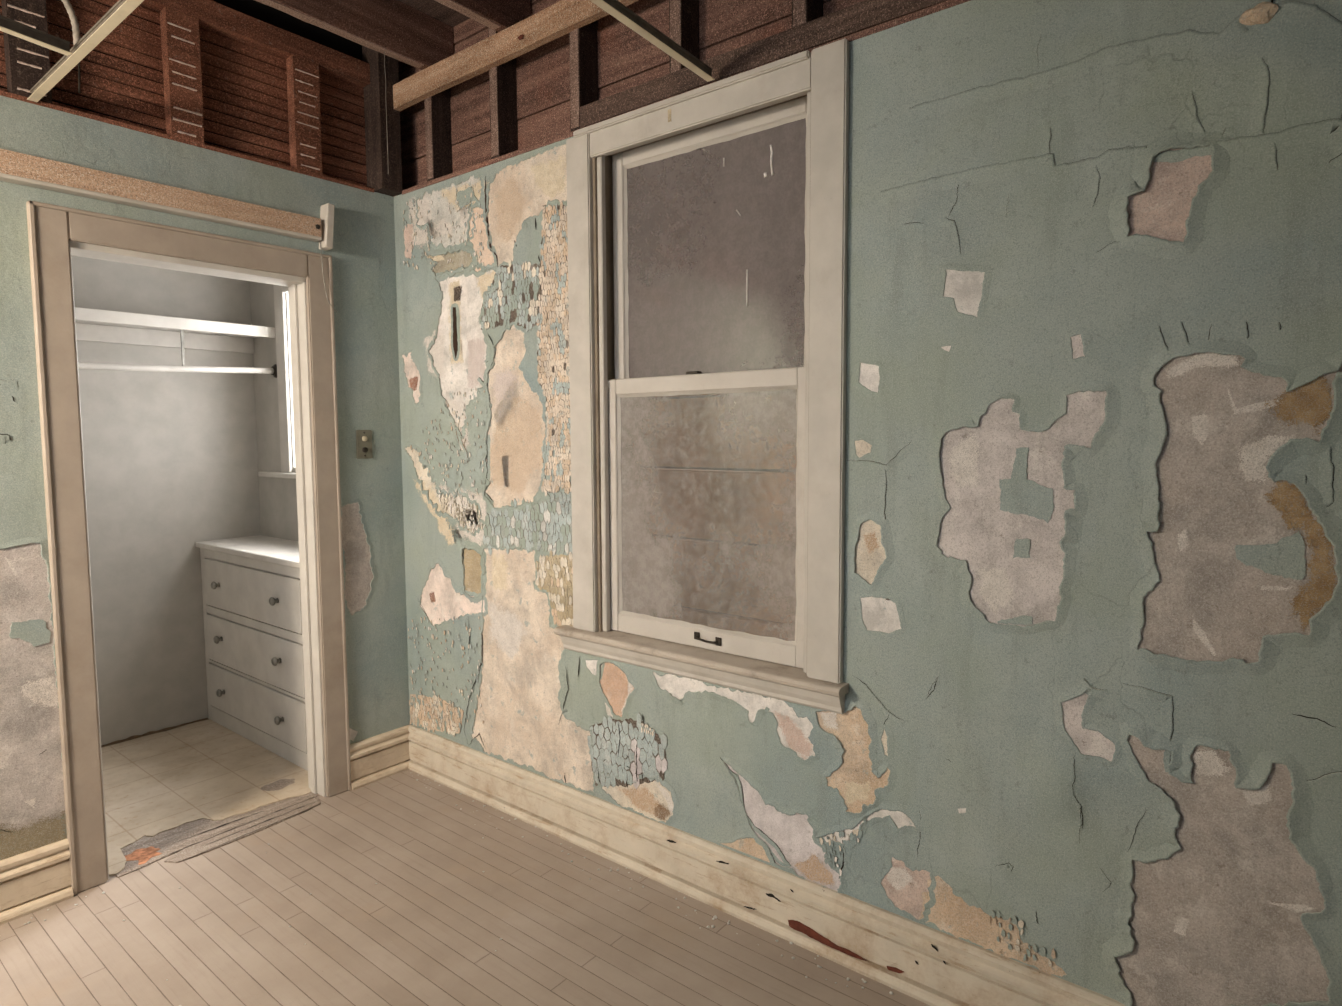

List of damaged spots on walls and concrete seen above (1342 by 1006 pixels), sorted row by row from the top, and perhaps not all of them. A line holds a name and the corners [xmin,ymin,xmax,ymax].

crack [902,185,965,257]
peeling [1108,118,1342,260]
crack [0,434,11,444]
peeling [0,536,65,836]
peeling [341,499,378,618]
peeling [401,137,923,902]
peeling [927,380,1122,635]
peeling [1129,338,1342,676]
peeling [1052,678,1342,1006]